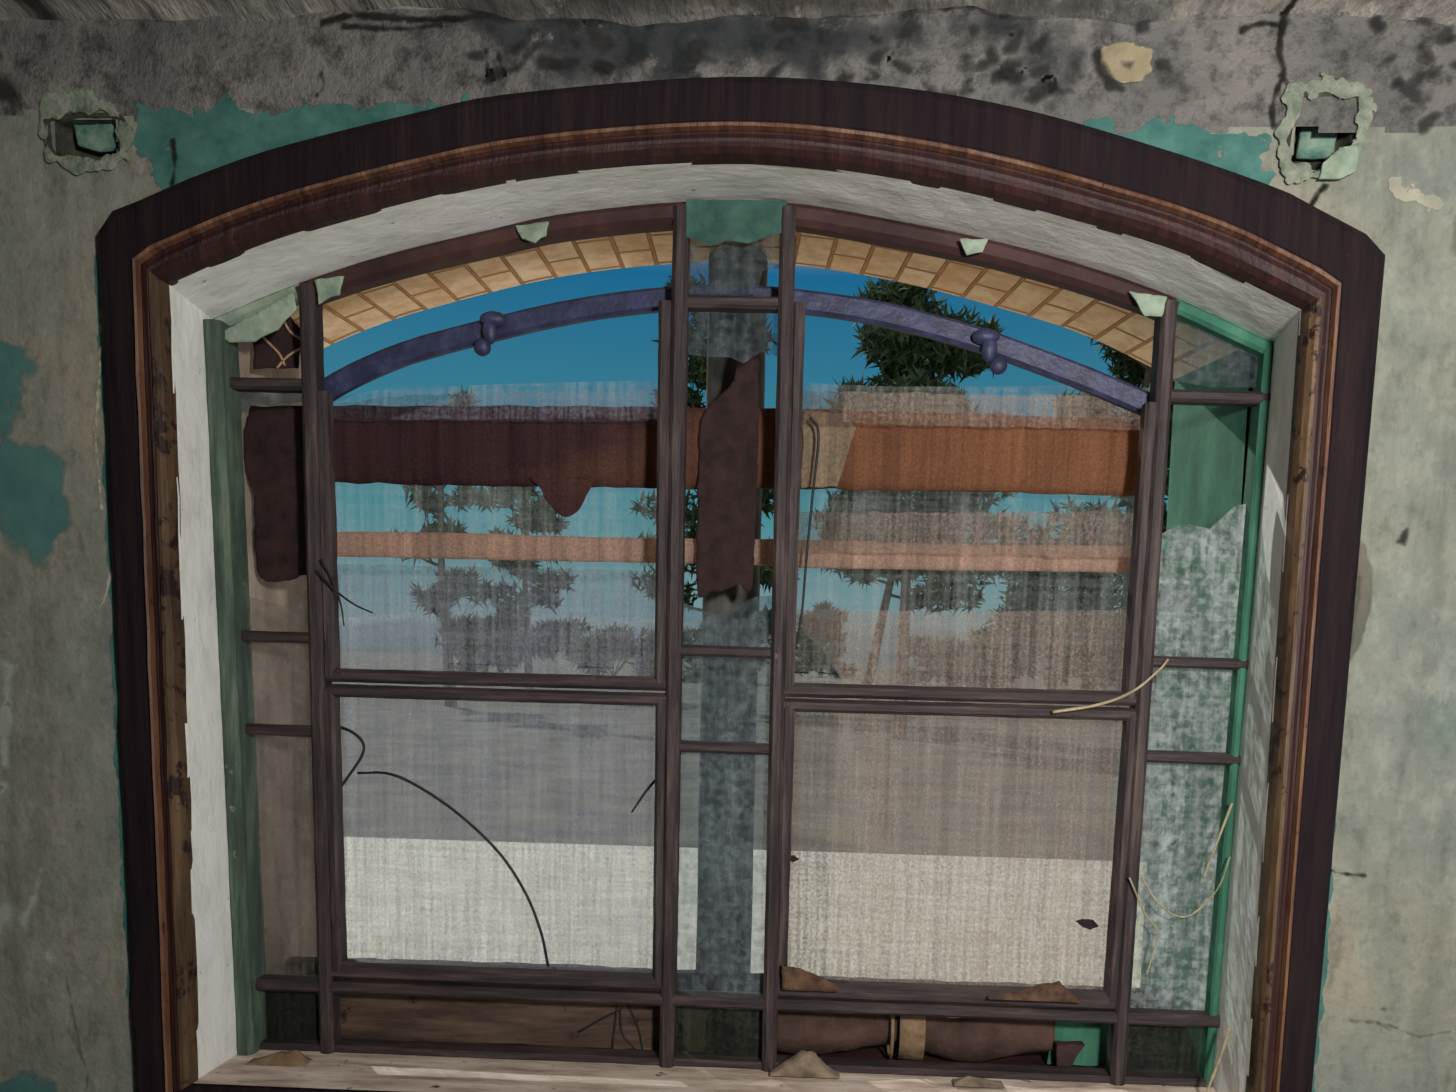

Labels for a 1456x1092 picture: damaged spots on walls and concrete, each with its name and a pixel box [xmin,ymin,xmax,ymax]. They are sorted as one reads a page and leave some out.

water stain [22,0,58,20]
water stain [470,10,916,80]
flaking render [1094,21,1171,90]
crack [1240,0,1297,128]
peeling [38,87,443,190]
spalling [1083,72,1378,185]
crack [1310,184,1329,206]
peeling [225,292,297,343]
peeling [314,276,344,305]
peeling [1128,291,1167,317]
peeling [0,343,68,562]
peeling [94,253,136,1092]